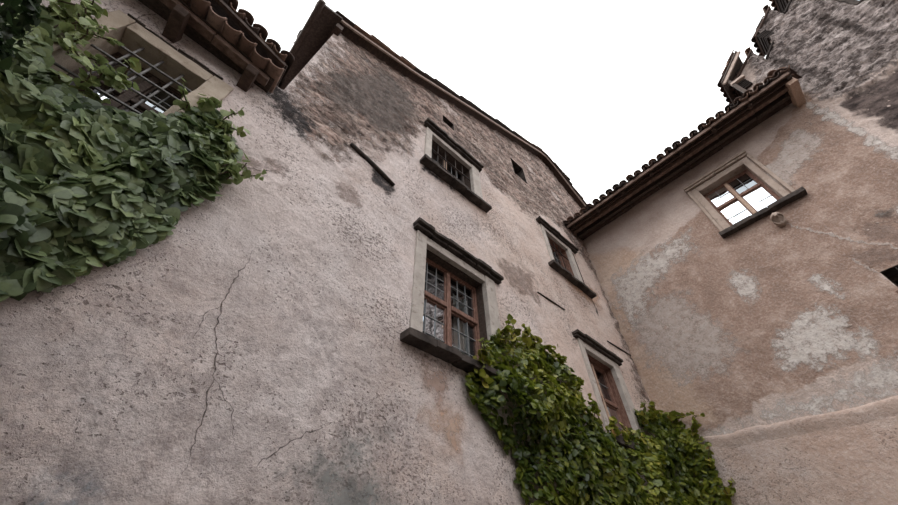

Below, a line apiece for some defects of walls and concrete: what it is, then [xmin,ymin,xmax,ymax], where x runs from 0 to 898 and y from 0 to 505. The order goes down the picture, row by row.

crack [177,251,252,482]
crack [256,427,323,467]